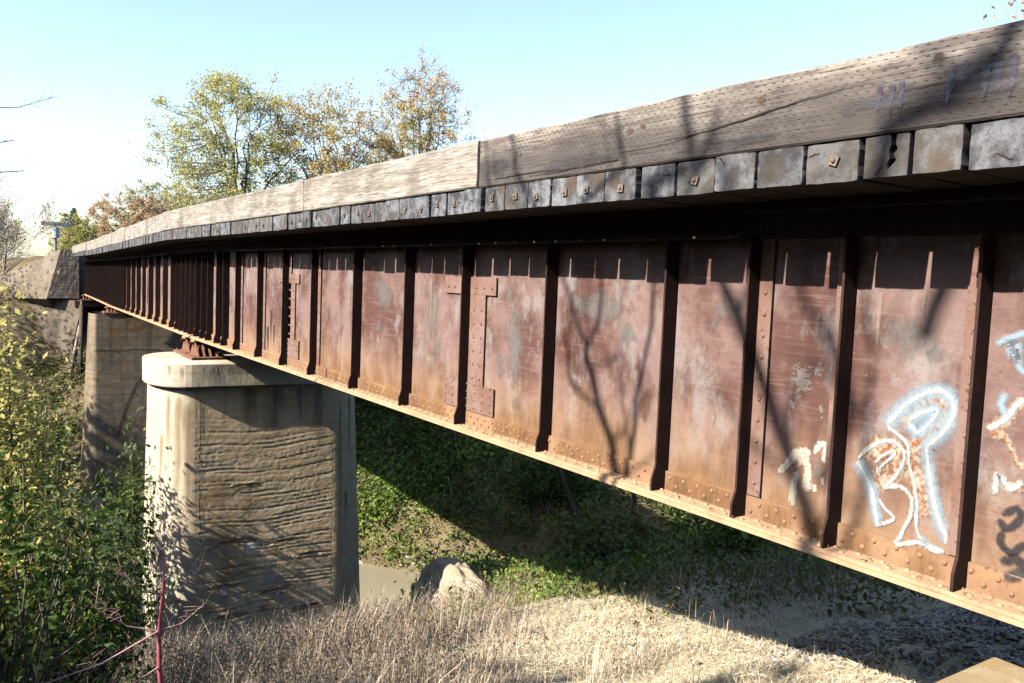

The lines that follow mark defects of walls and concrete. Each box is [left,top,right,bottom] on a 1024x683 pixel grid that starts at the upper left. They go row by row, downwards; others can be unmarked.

crack [458,66,995,203]
corrosion [318,363,396,399]
peeling [789,363,831,409]
corrosion [494,410,537,445]
corrosion [558,436,623,473]
corrosion [667,471,728,508]